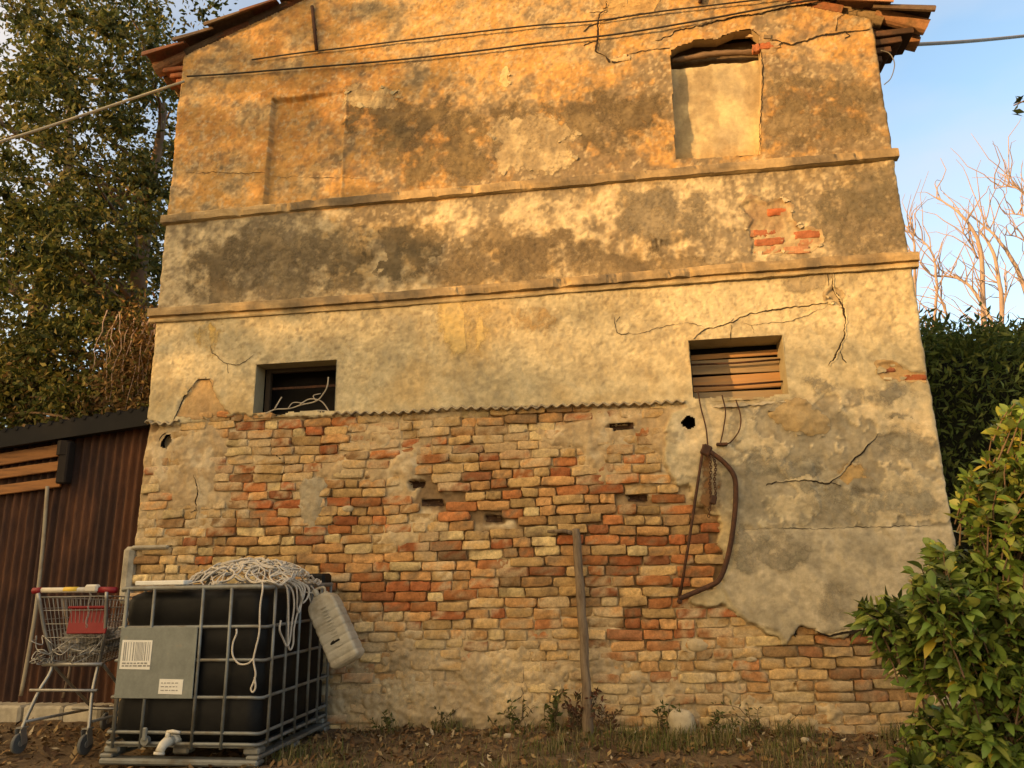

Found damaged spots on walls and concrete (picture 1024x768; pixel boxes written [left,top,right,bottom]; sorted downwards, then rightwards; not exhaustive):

crack [583,0,870,151]
spalling [740,194,825,255]
crack [614,273,848,366]
spalling [874,359,927,383]
spalling [177,377,234,420]
spalling [609,422,634,431]
spalling [681,415,695,429]
crack [766,432,879,486]
spalling [409,481,444,506]
spalling [628,494,647,502]